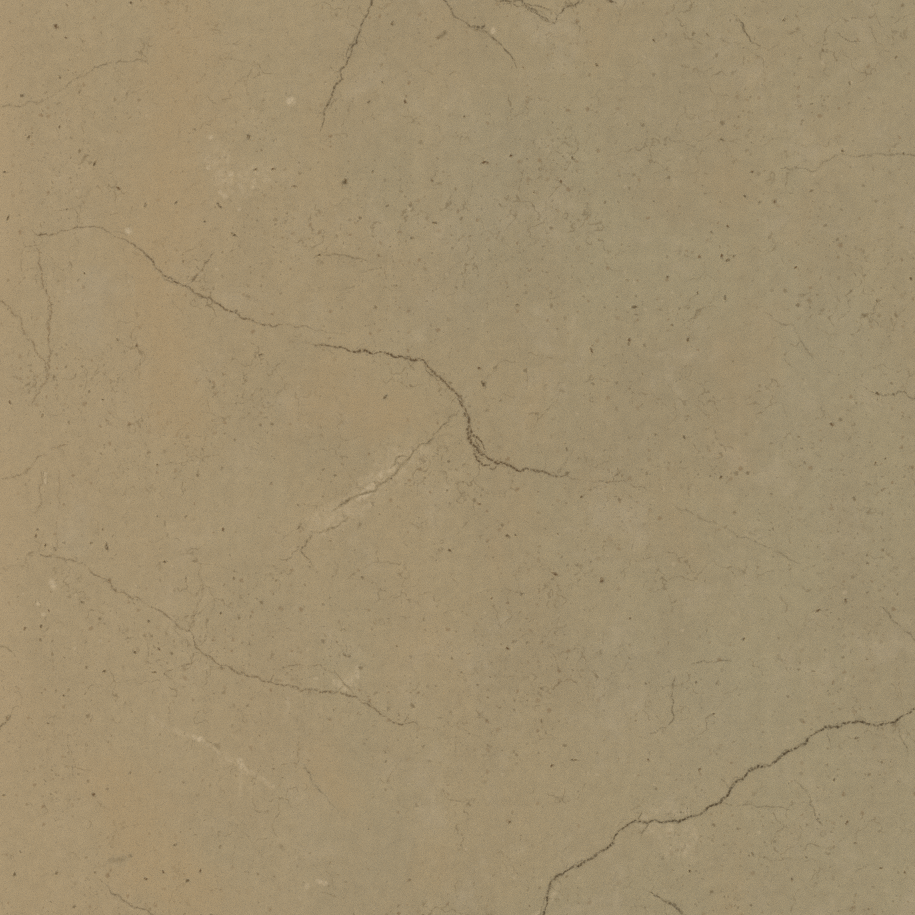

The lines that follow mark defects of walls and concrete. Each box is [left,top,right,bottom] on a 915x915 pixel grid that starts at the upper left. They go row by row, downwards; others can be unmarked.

crack [315,0,384,131]
crack [440,0,585,68]
crack [731,12,761,47]
crack [780,151,915,174]
crack [0,225,655,567]
crack [0,443,437,730]
crack [649,659,732,742]
crack [538,705,915,915]